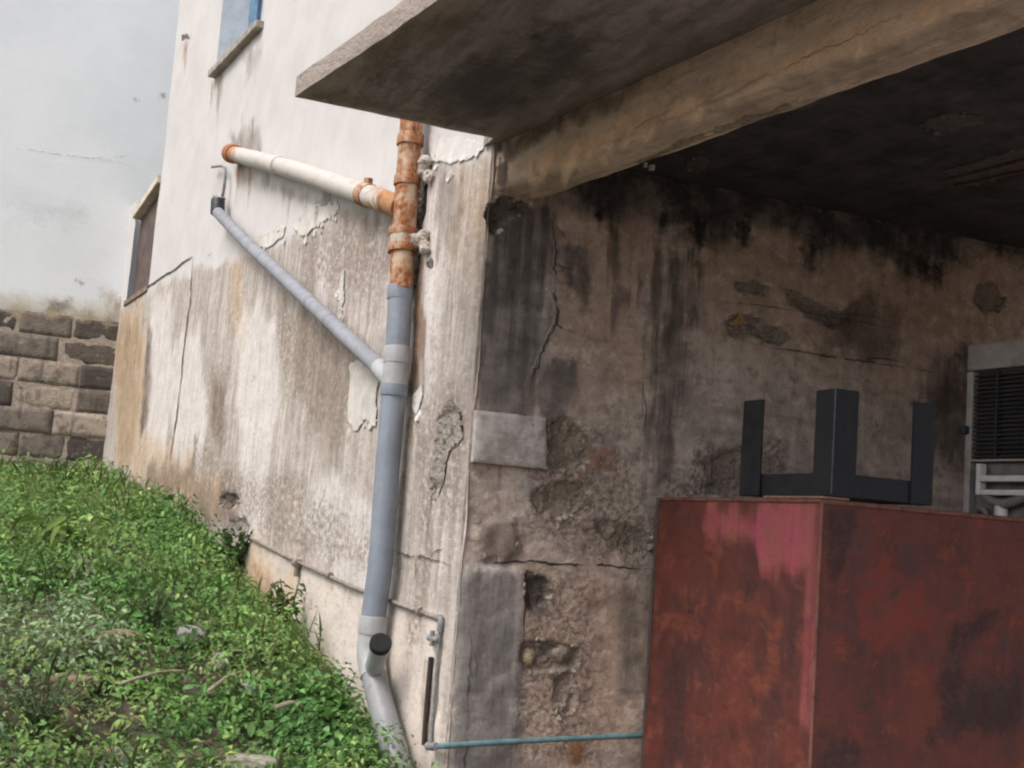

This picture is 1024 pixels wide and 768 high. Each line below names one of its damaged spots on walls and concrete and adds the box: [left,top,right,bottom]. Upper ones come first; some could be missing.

peeling [255,199,340,252]
spalling [483,195,533,235]
crack [147,254,210,457]
crack [529,223,573,397]
spalling [724,313,791,347]
spalling [785,287,853,330]
spalling [975,281,1008,316]
peeling [348,360,379,430]
spalling [427,400,463,502]
spalling [522,570,553,613]
crack [480,544,650,631]
spalling [518,637,584,720]